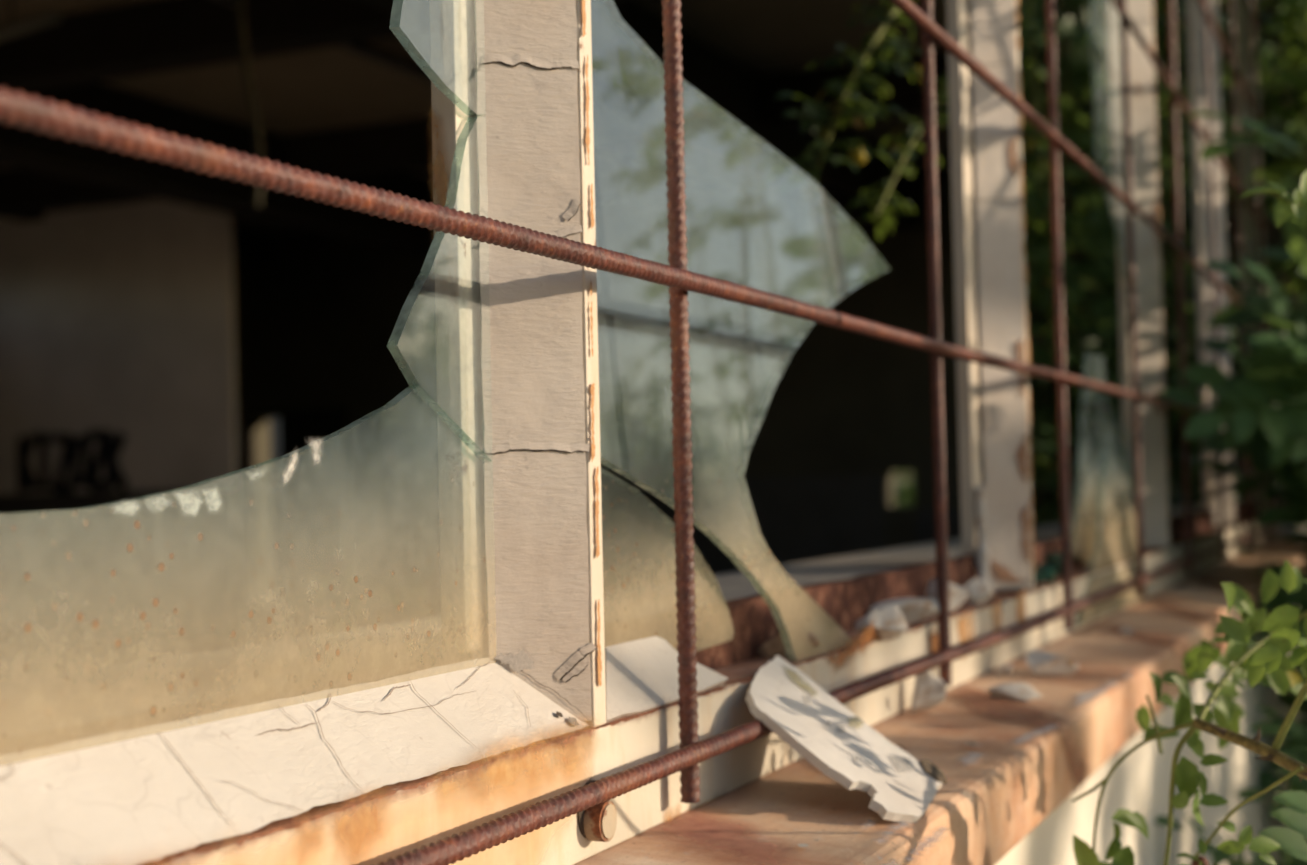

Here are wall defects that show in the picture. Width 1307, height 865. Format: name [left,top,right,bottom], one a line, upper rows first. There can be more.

crack [481,54,579,70]
crack [545,198,582,238]
rust [590,383,600,558]
rust [713,625,879,682]
crack [258,642,597,795]
rust [224,738,587,865]